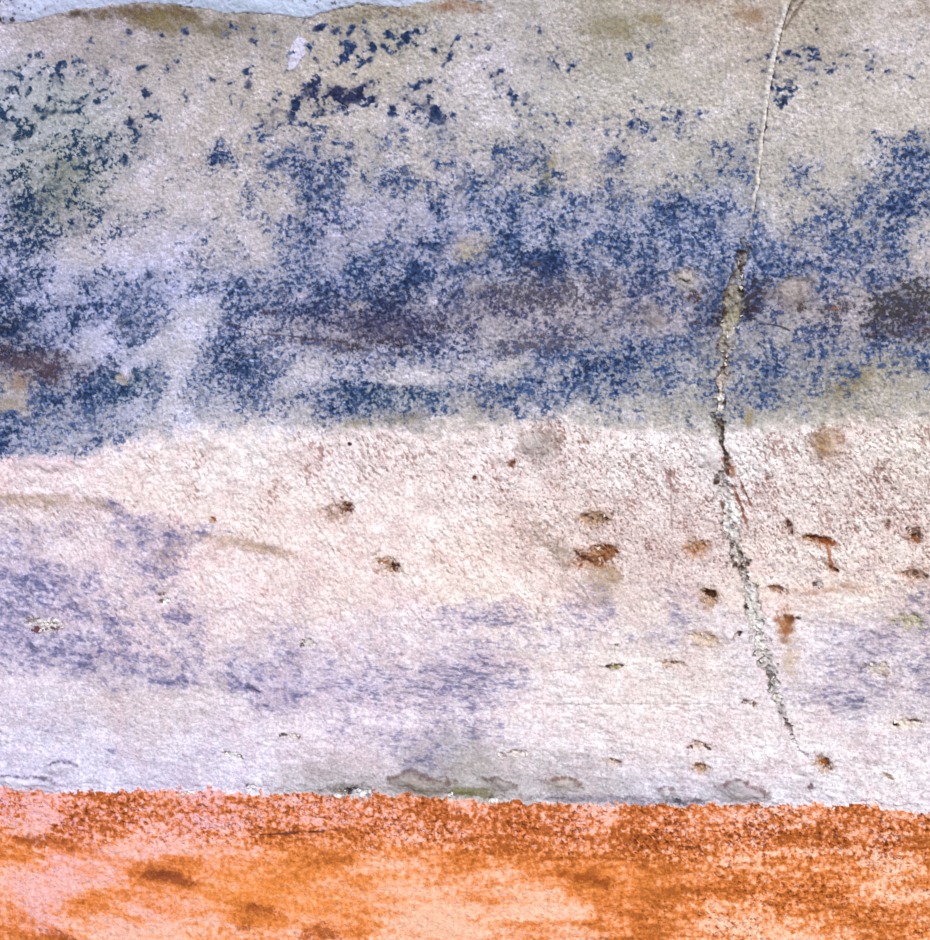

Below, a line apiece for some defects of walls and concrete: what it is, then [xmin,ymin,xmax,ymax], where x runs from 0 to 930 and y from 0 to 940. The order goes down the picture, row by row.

peeling [0,0,15,22]
damp [439,0,482,13]
crack [751,4,789,213]
damp [0,6,930,459]
crack [695,244,790,724]
corrosion [6,834,73,848]
corrosion [143,870,194,886]
corrosion [559,872,610,890]
corrosion [294,922,341,940]